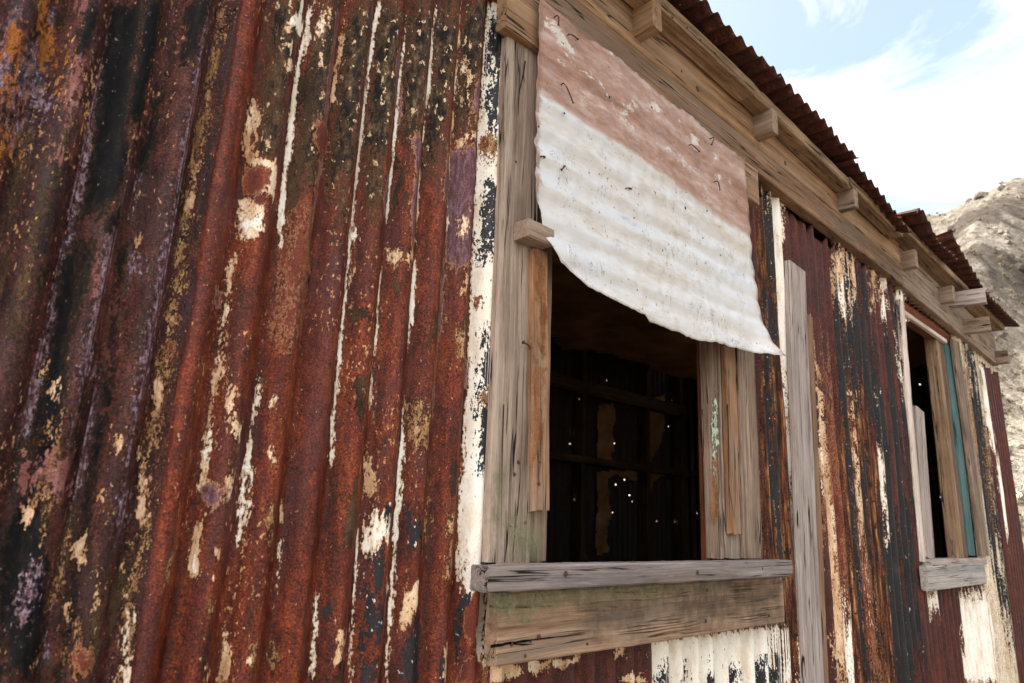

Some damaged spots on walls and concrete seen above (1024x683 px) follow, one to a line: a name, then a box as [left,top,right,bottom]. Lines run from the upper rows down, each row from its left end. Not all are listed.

corrosion [0,0,80,169]
peeling [38,0,235,683]
peeling [190,0,346,595]
corrosion [267,116,331,356]
peeling [308,1,585,683]
peeling [20,499,37,530]
corrosion [47,615,100,682]
corrosion [191,471,231,514]
peeling [813,329,855,683]
corrosion [817,303,897,683]
peeling [927,590,940,623]
peeling [957,584,999,683]